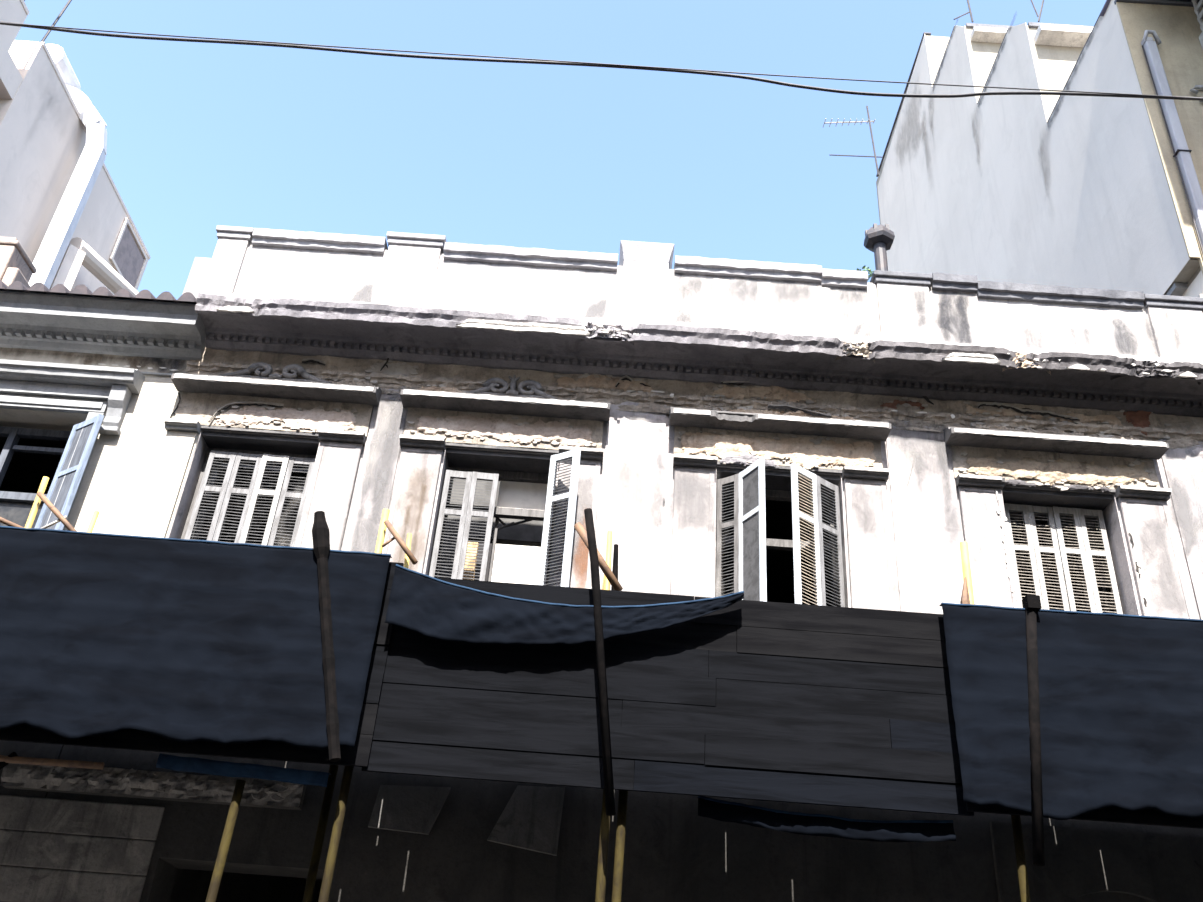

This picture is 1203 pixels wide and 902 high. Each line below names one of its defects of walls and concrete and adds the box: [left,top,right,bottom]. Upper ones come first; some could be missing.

water stain [713,279,728,327]
water stain [758,283,770,330]
water stain [819,286,853,334]
water stain [915,292,971,344]
water stain [1113,313,1158,354]
flaking render [326,360,467,393]
flaking render [214,401,362,433]
flaking render [407,414,597,447]
flaking render [678,431,876,471]
flaking render [705,385,864,421]
flaking render [950,401,1203,440]
flaking render [958,452,1157,593]